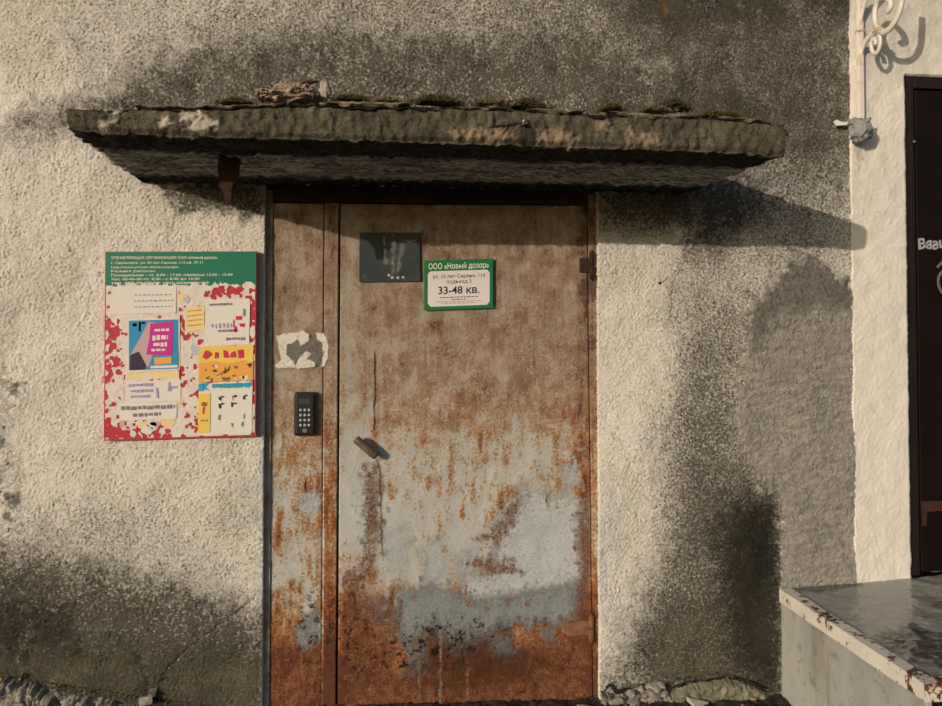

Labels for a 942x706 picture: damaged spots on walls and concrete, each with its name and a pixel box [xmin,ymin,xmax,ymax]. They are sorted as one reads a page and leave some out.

spalling [0,675,164,706]
leakage [0,542,263,706]
corrosion [272,595,322,706]
corrosion [342,458,589,706]
spalling [599,680,669,706]
leakage [604,460,782,694]